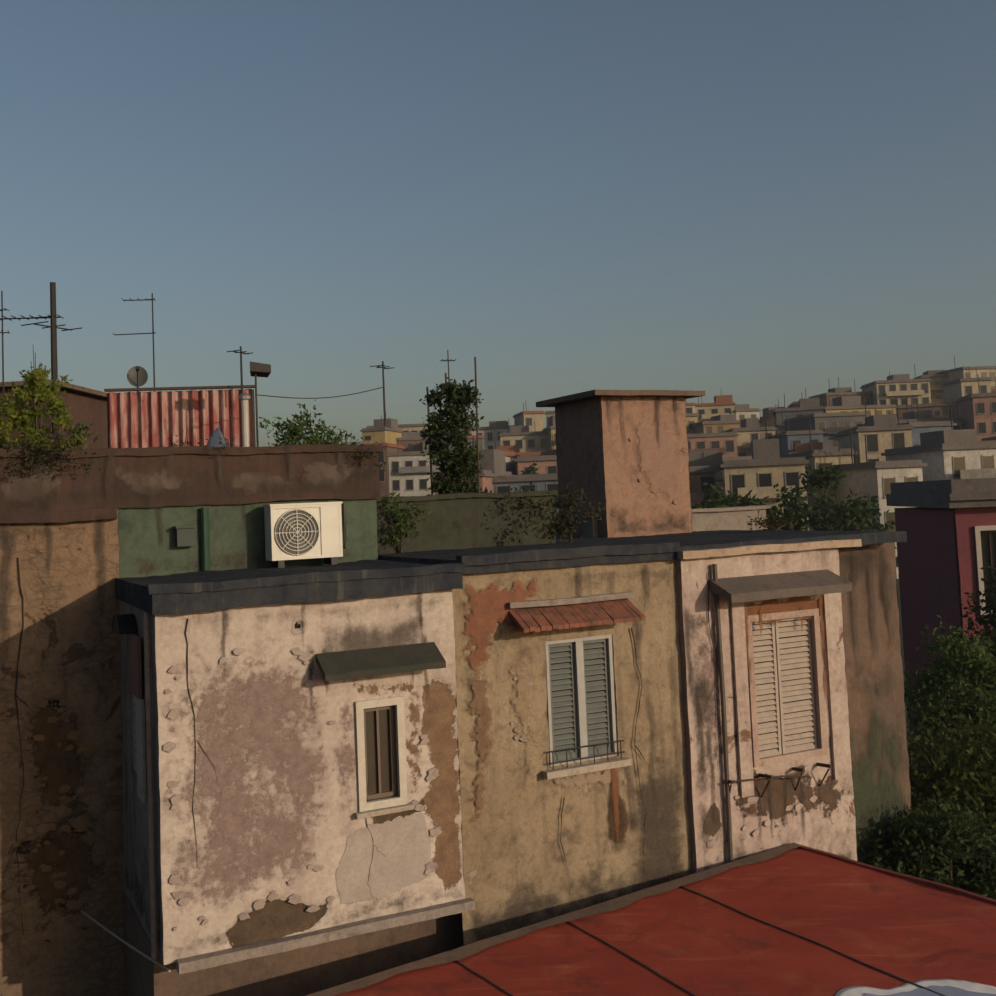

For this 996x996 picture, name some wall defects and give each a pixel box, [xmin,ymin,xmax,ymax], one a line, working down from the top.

crack [1,557,41,935]
crack [184,618,221,850]
peeling [163,647,336,948]
spalling [354,578,539,890]
corrosion [609,768,629,851]
spalling [735,765,850,837]